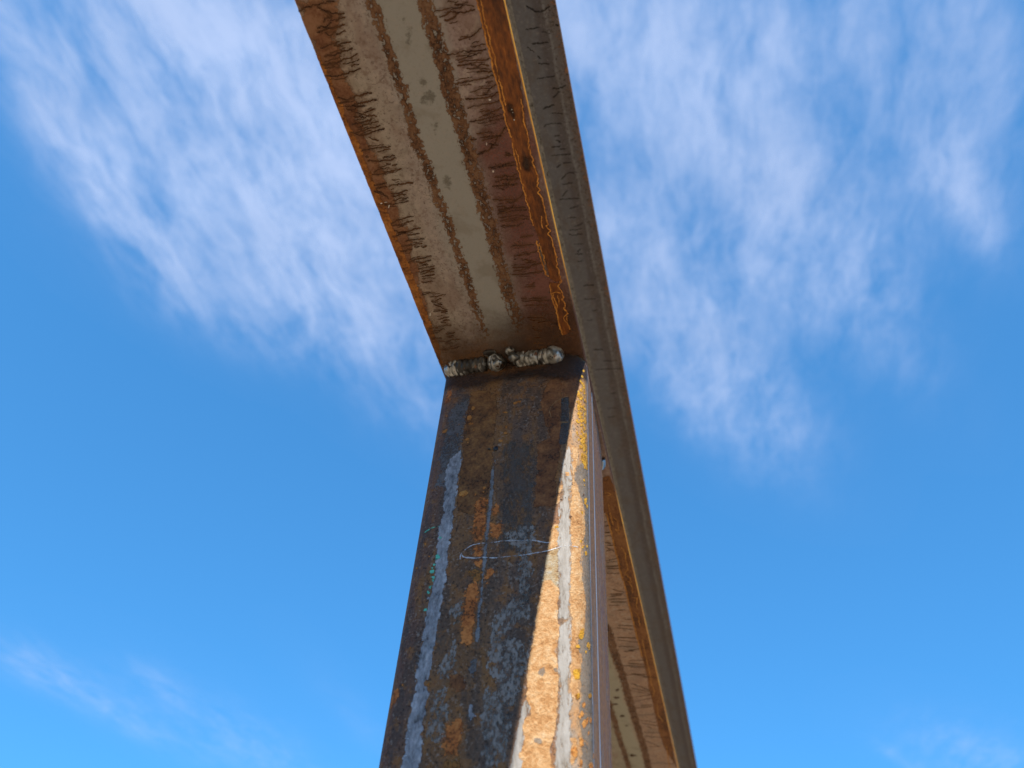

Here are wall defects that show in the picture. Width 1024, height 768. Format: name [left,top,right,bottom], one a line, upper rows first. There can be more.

rust [296,0,441,365]
rust [365,0,490,338]
rust [416,0,579,337]
rust [441,718,464,758]
rust [442,390,521,646]
rust [518,370,594,768]
peeling [559,397,570,445]
rust [603,476,676,768]